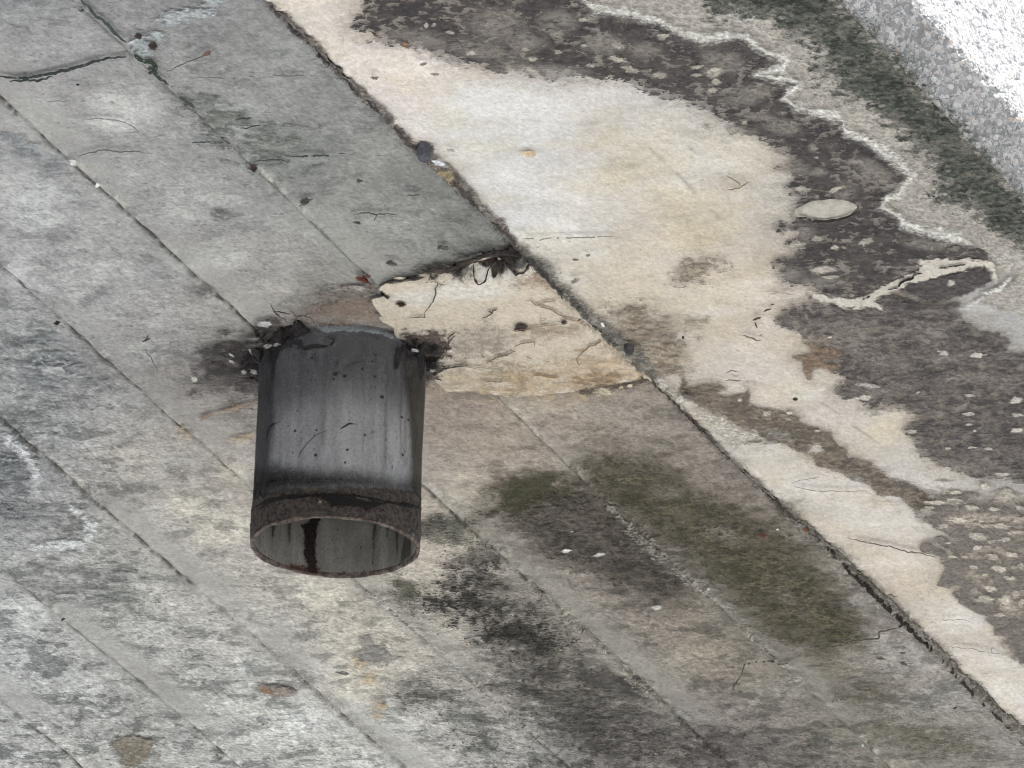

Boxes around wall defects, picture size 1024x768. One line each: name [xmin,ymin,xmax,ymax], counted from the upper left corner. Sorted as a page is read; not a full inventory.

water stain [260,337,305,398]
rust [250,486,422,542]
water stain [354,461,845,768]
spalling [269,2,1024,747]
water stain [350,0,1024,666]